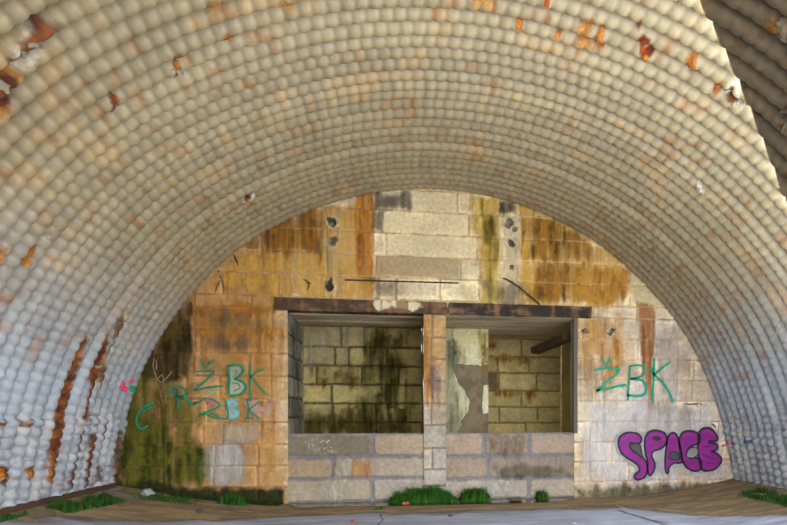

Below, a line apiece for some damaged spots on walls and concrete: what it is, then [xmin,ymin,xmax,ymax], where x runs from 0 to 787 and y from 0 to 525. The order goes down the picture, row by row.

rust [577,20,605,48]
rust [637,20,654,63]
peeling [776,16,787,43]
rust [20,246,35,267]
rust [196,194,374,367]
rust [518,205,629,305]
rust [47,335,87,483]
rust [83,309,128,421]
peeling [446,362,488,433]
rust [637,303,654,423]
rust [0,466,9,486]
rust [68,423,108,488]